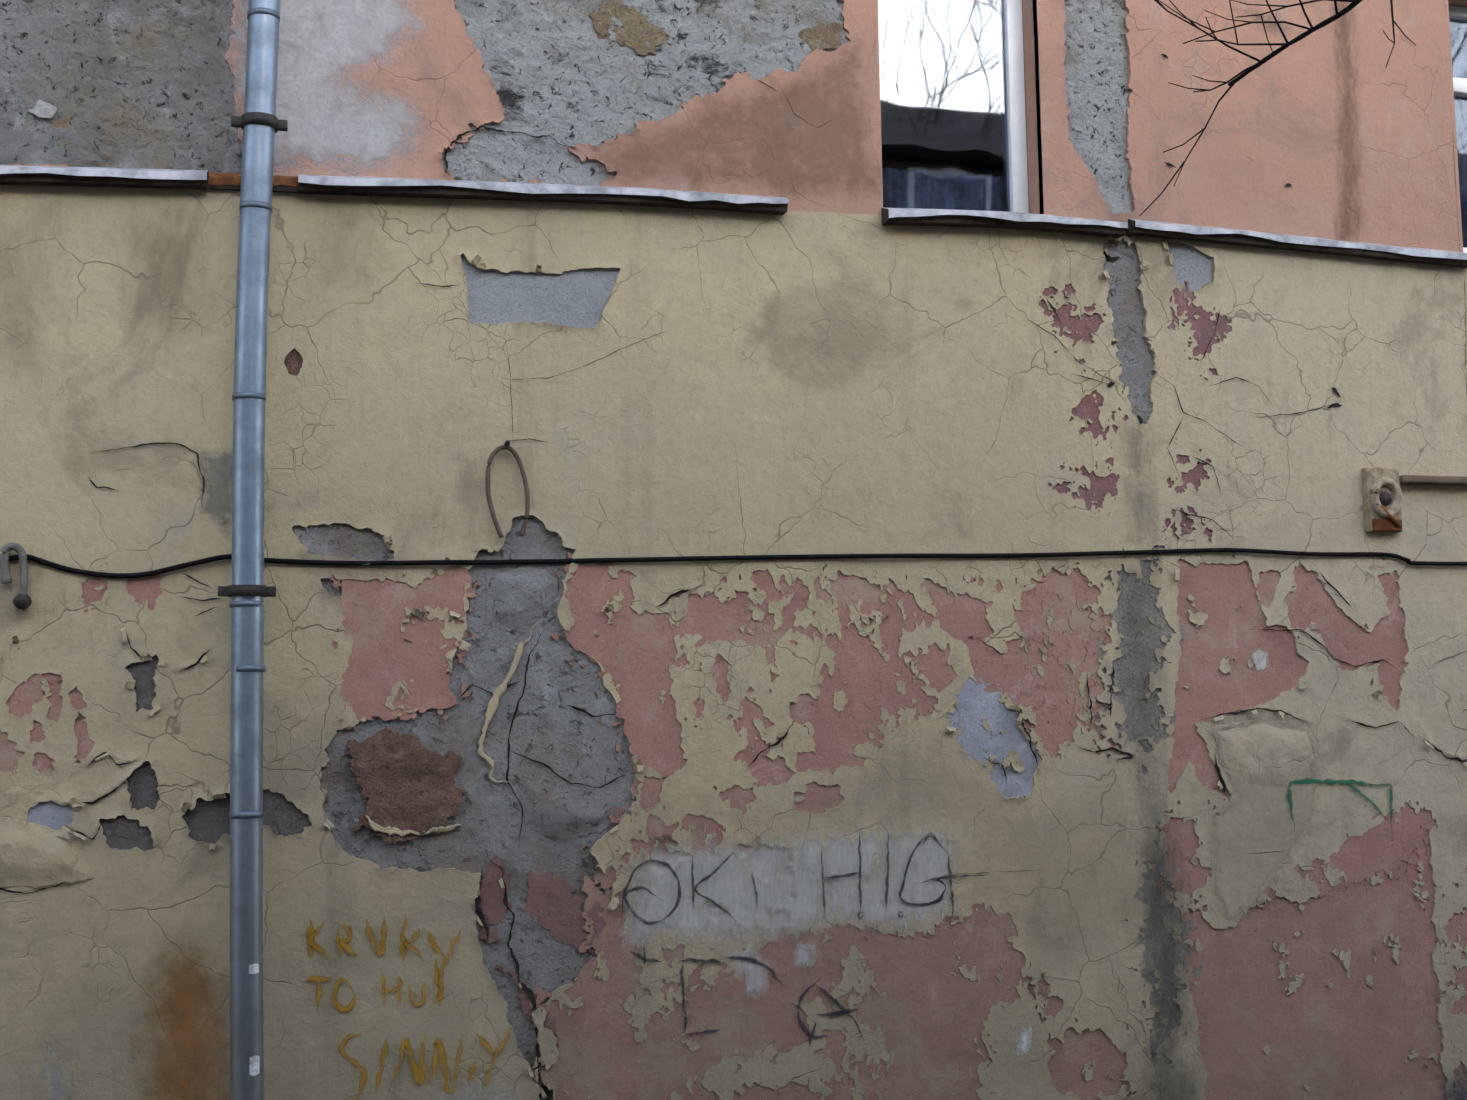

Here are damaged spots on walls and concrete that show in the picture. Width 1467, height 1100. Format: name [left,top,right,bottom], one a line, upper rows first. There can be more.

spalling [0,0,243,181]
crack [444,125,572,174]
spalling [442,0,849,186]
peeling [461,254,619,329]
spalling [1039,0,1155,512]
crack [88,442,205,508]
crack [1031,298,1339,540]
peeling [99,761,160,852]
crack [457,634,625,1100]
spalling [263,439,1467,1100]
crack [1077,666,1133,760]
crack [1203,708,1303,795]